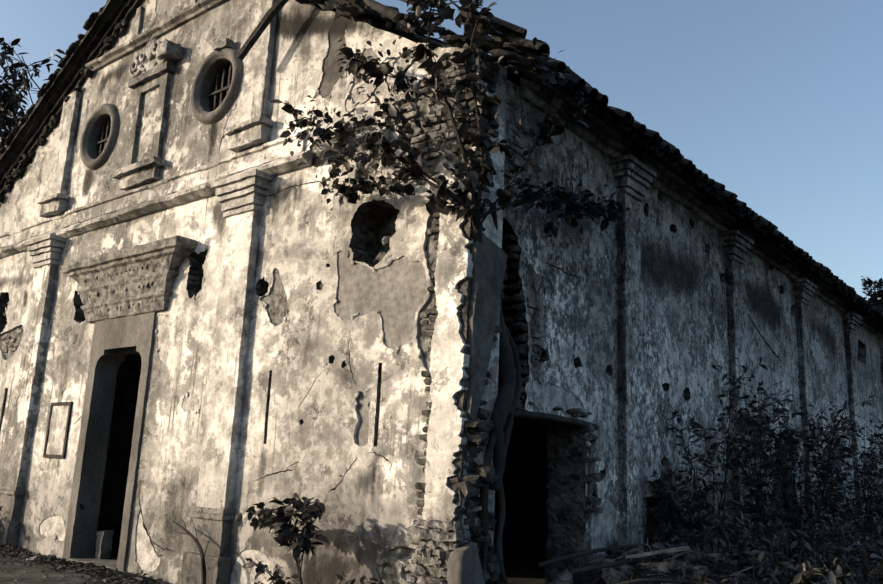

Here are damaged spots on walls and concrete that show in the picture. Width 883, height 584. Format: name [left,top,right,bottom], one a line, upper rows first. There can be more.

spalling [316,11,425,113]
flaking render [387,53,462,186]
flaking render [0,292,23,361]
spalling [186,249,208,301]
peeling [255,268,288,326]
spalling [326,199,440,370]
damp [641,242,699,293]
damp [725,266,736,402]
damp [745,283,782,329]
crack [254,462,299,481]
crack [330,452,389,491]
crack [139,491,172,557]